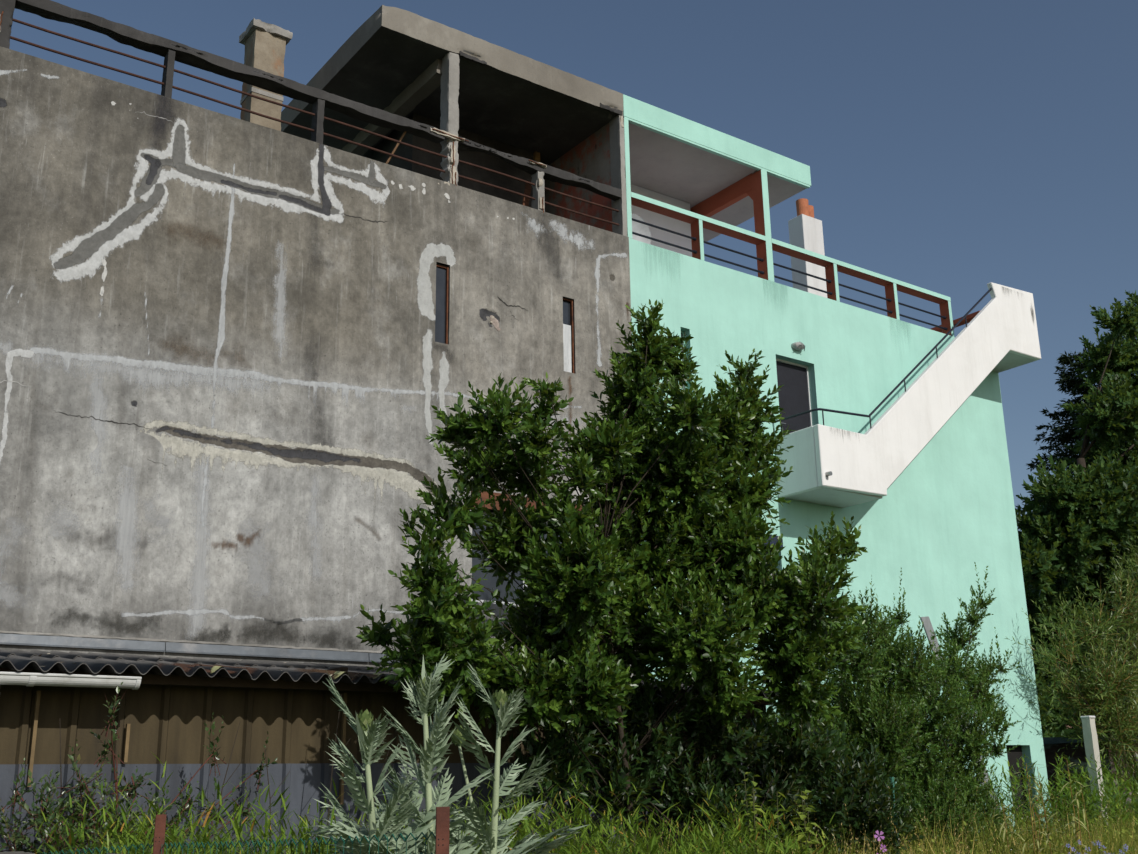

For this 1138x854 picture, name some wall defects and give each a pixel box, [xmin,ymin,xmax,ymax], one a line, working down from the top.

crack [49,112,390,282]
spalling [480,308,501,331]
crack [60,412,452,510]